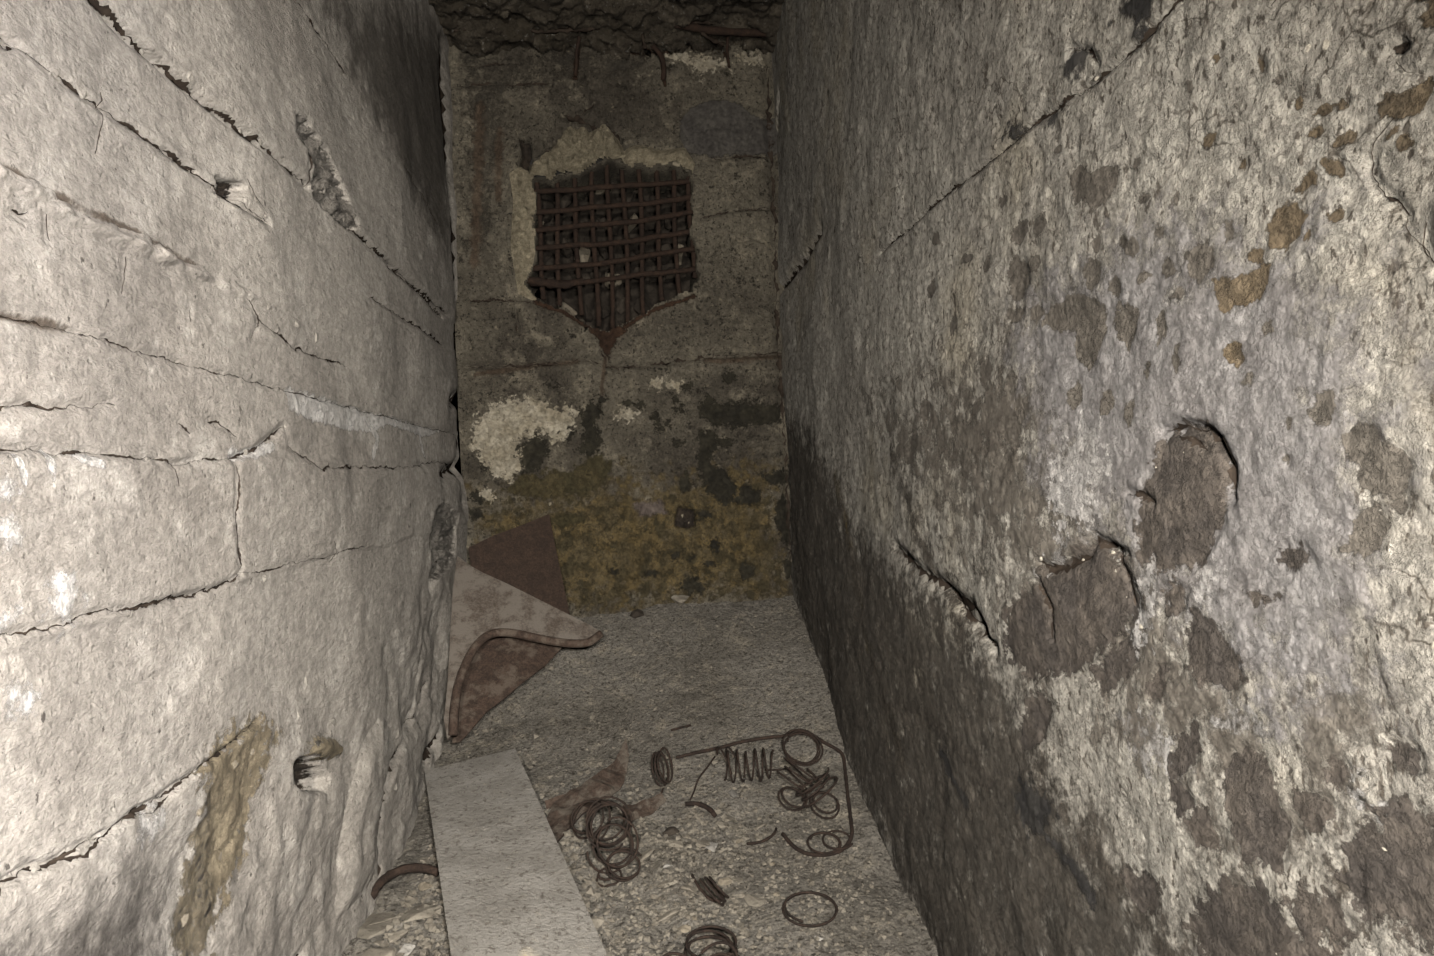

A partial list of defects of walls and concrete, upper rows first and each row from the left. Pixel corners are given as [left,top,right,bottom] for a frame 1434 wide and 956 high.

crack [0,0,313,224]
spalling [296,114,360,230]
spalling [509,124,695,300]
crack [889,0,1182,246]
peeling [1418,0,1434,28]
crack [0,54,822,635]
rust [533,294,697,412]
peeling [852,76,1434,956]
leakage [1006,212,1370,744]
leakage [465,371,1205,956]
crack [0,723,254,896]
leakage [1346,761,1389,825]